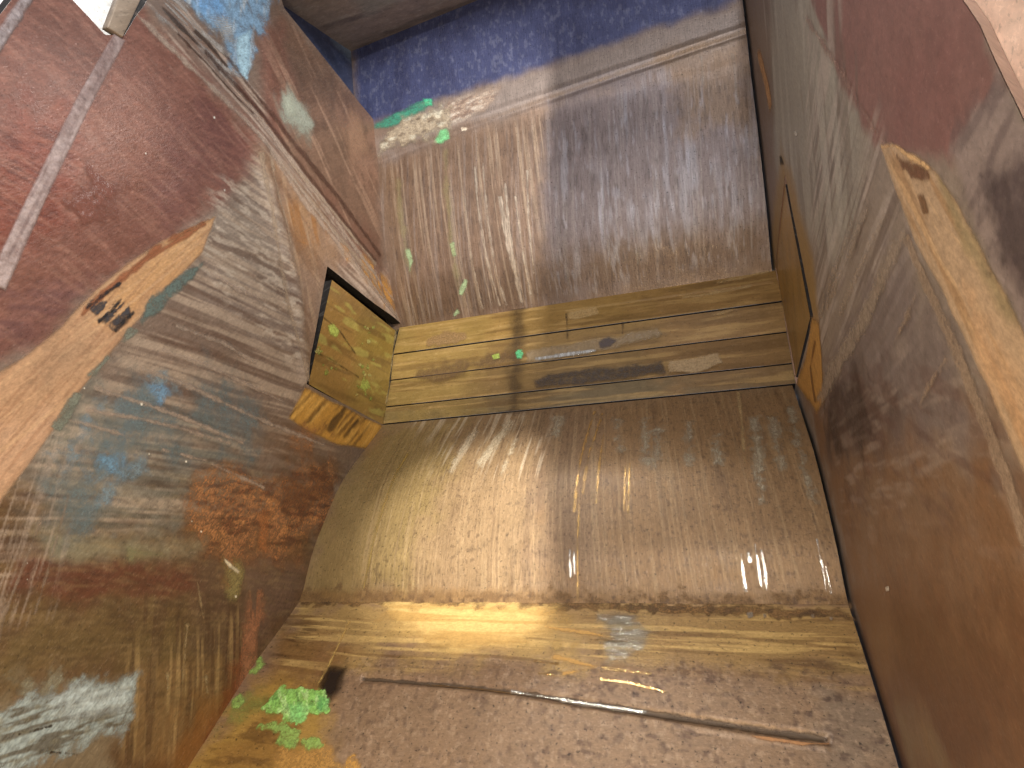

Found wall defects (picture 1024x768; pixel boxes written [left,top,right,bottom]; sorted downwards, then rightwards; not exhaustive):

corrosion [187,388,382,567]